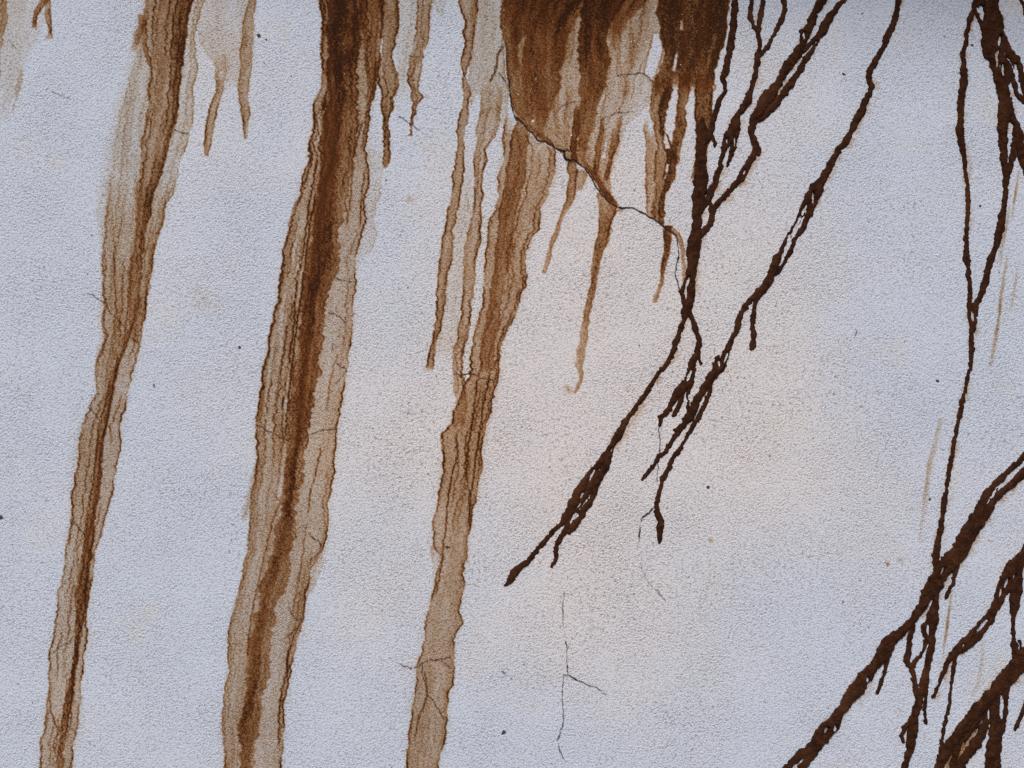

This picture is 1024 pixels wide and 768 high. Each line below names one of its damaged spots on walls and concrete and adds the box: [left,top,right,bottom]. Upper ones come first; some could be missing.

corrosion [40,0,194,766]
corrosion [238,0,423,768]
corrosion [427,0,730,599]
crack [489,42,680,289]